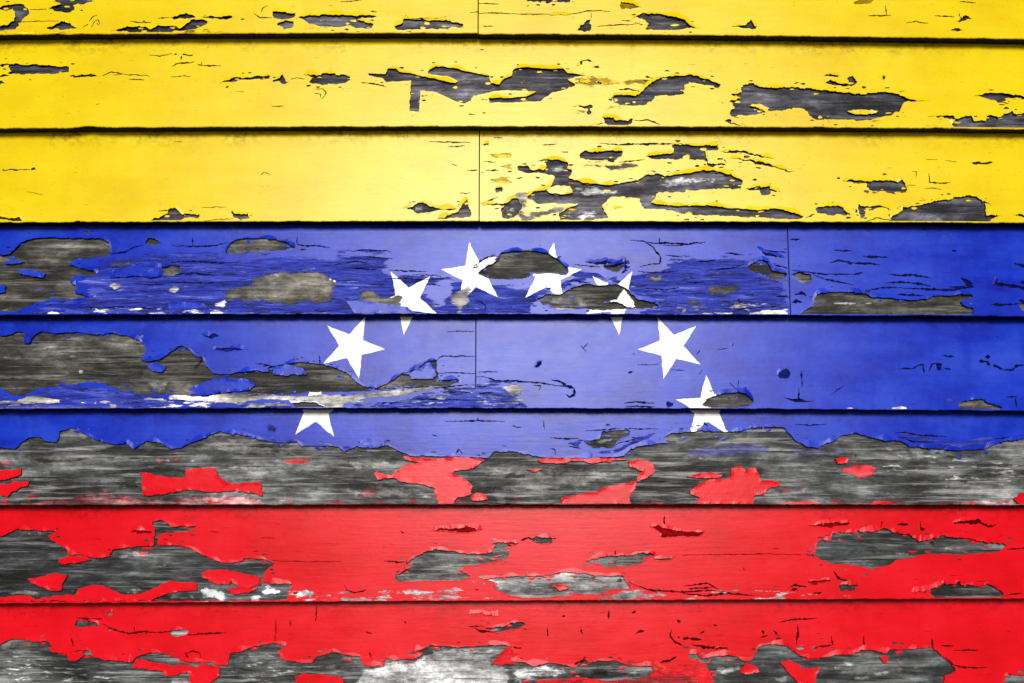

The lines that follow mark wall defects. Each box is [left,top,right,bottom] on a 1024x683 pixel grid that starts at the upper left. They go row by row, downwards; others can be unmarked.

peeling [368,59,1024,128]
peeling [401,140,1000,221]
peeling [0,231,975,408]
peeling [0,422,1024,538]
peeling [802,517,1013,599]
peeling [0,519,957,683]
peeling [1002,670,1024,683]